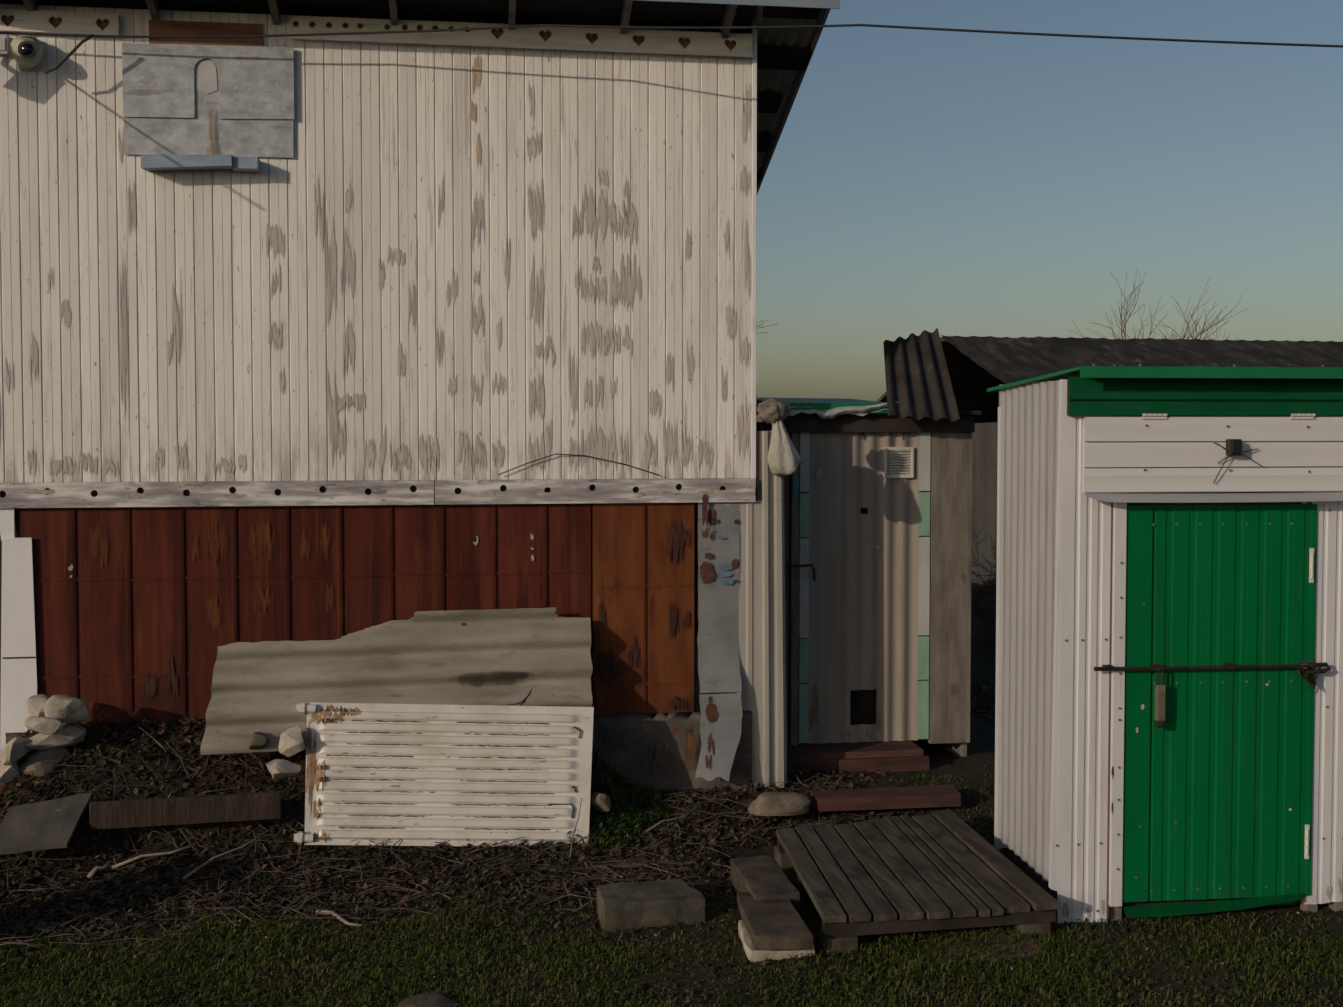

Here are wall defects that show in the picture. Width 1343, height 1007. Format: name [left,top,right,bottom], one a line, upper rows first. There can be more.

peeling [472,194,485,249]
peeling [724,221,752,299]
peeling [167,278,182,366]
peeling [314,178,365,465]
peeling [446,269,502,350]
peeling [528,166,641,472]
peeling [363,429,439,474]
peeling [436,329,506,405]
peeling [644,346,713,472]
peeling [721,305,751,460]
rust [699,494,739,584]
rust [673,696,719,770]